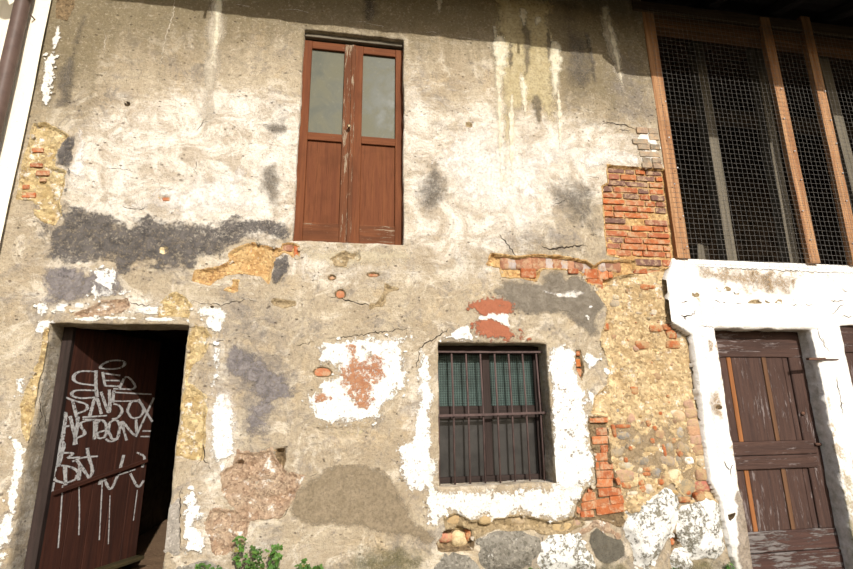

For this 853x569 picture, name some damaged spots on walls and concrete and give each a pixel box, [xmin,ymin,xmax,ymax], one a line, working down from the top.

spalling [16,122,70,226]
damp [56,130,85,176]
damp [204,0,223,120]
damp [425,0,638,219]
spalling [0,265,305,567]
damp [34,166,289,302]
spalling [192,242,303,293]
damp [227,346,294,435]
spalling [301,127,719,552]
damp [494,272,604,335]
damp [292,464,435,544]